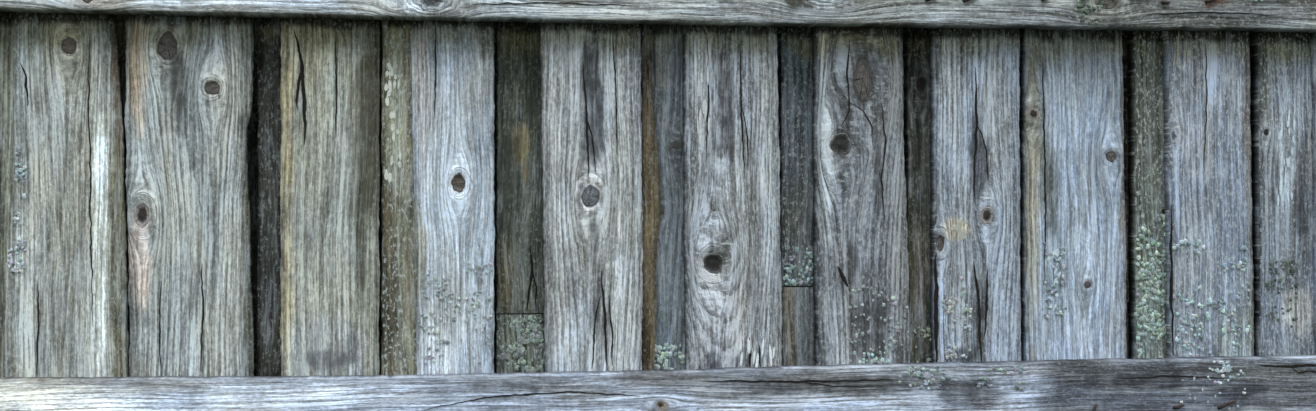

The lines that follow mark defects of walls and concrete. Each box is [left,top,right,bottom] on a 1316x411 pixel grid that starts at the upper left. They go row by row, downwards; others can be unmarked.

crack [294,30,338,145]
crack [973,67,989,197]